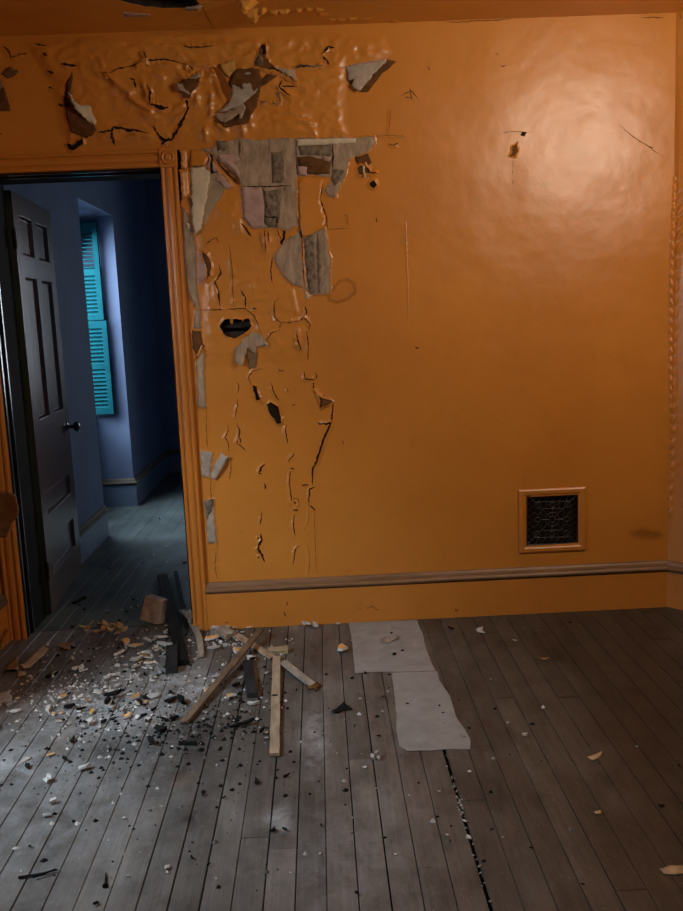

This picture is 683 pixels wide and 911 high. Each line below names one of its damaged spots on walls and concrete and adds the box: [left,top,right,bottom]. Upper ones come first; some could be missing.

peeling [252,42,331,87]
peeling [63,137,87,153]
crack [318,186,348,230]
peeling [177,134,381,410]
crack [193,223,338,564]